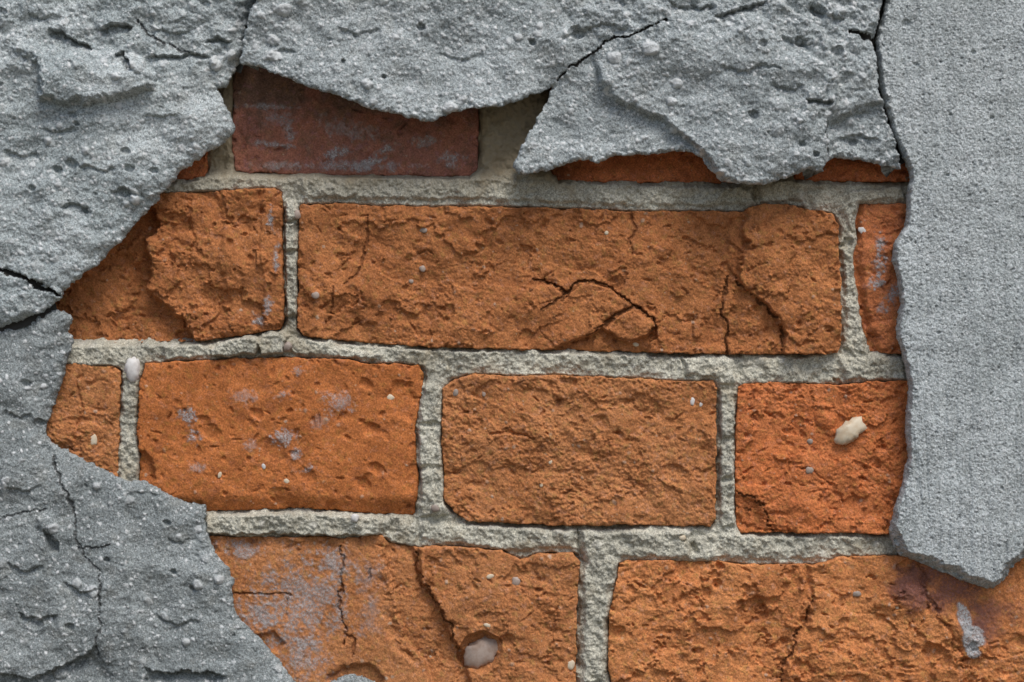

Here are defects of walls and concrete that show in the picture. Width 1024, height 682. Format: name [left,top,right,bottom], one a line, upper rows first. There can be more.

crack [557,18,668,81]
peeling [594,0,901,185]
crack [848,0,905,165]
spalling [62,202,90,215]
crack [0,268,61,332]
spalling [55,207,194,343]
spalling [532,278,658,353]
spalling [139,451,155,484]
spalling [43,531,59,553]
spalling [385,542,471,682]
spalling [0,647,107,682]
spalling [147,668,223,682]